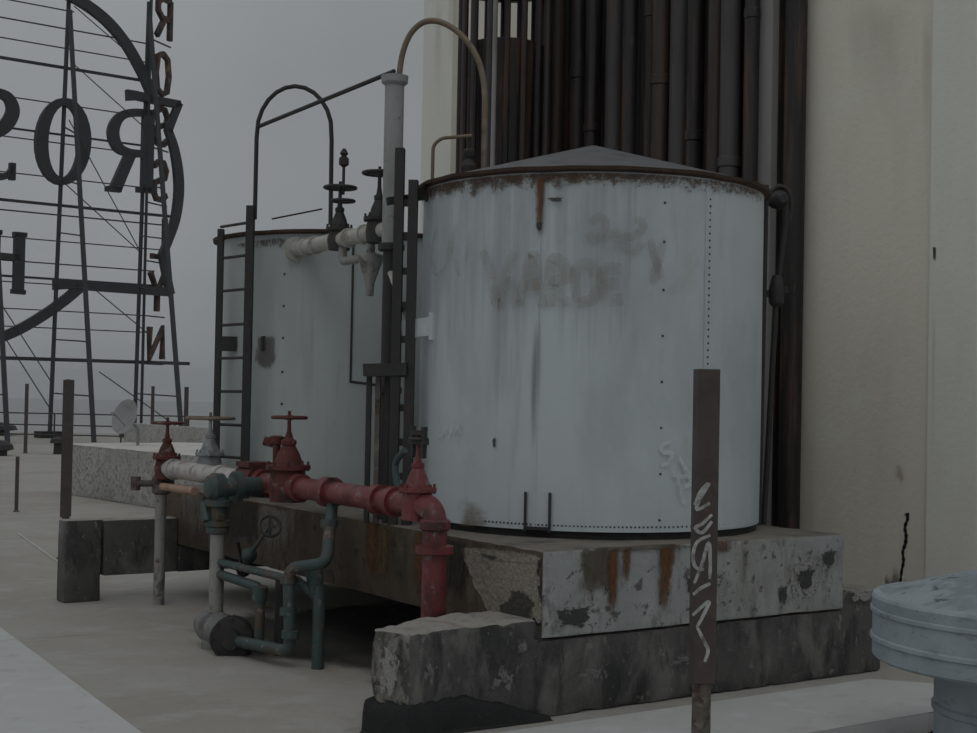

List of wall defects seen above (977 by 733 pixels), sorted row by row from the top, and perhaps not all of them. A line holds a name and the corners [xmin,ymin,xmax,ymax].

rust [422,173,761,230]
spalling [462,547,543,623]
peeling [557,605,597,628]
rust [582,544,691,608]
peeling [779,550,837,605]
crack [899,512,909,582]